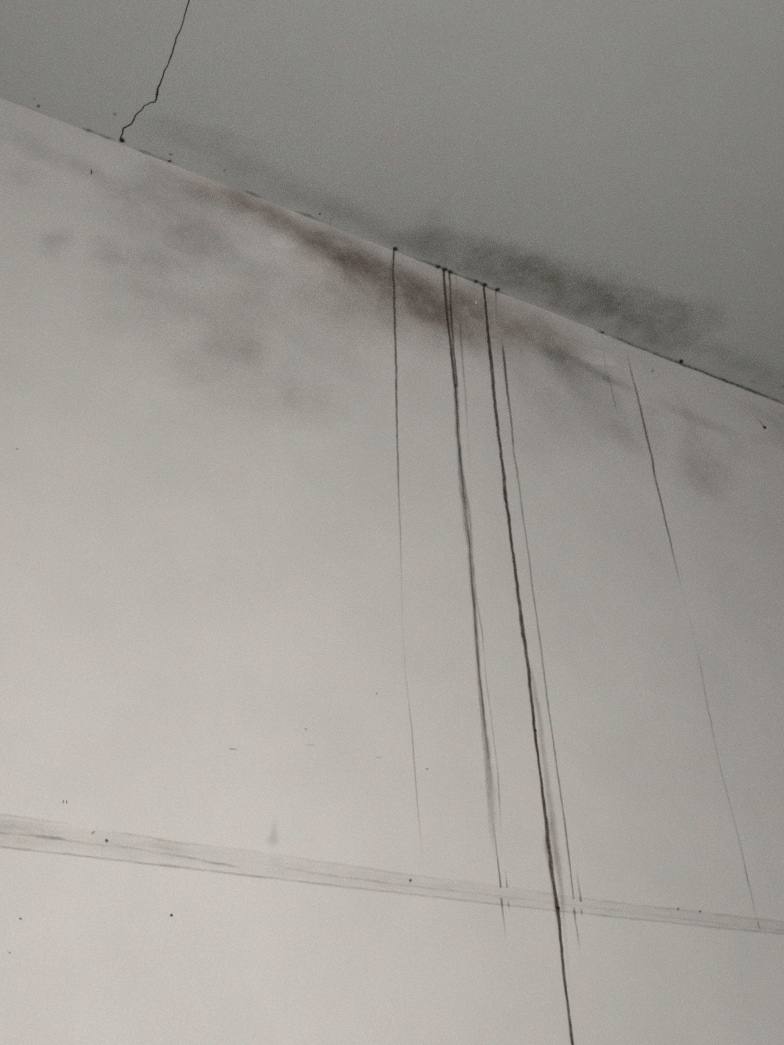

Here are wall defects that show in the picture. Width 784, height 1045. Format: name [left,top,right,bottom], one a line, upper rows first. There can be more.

crack [120,0,190,142]
damp [436,265,461,470]
damp [474,280,574,1045]